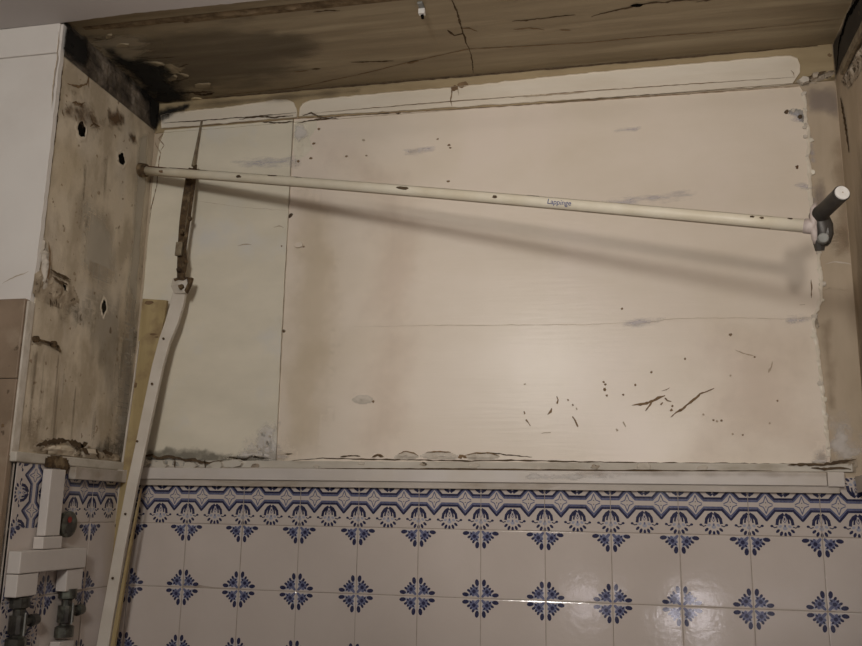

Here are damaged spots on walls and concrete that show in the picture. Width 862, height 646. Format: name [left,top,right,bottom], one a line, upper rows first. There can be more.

leakage [106,49,189,125]
crack [149,0,859,223]